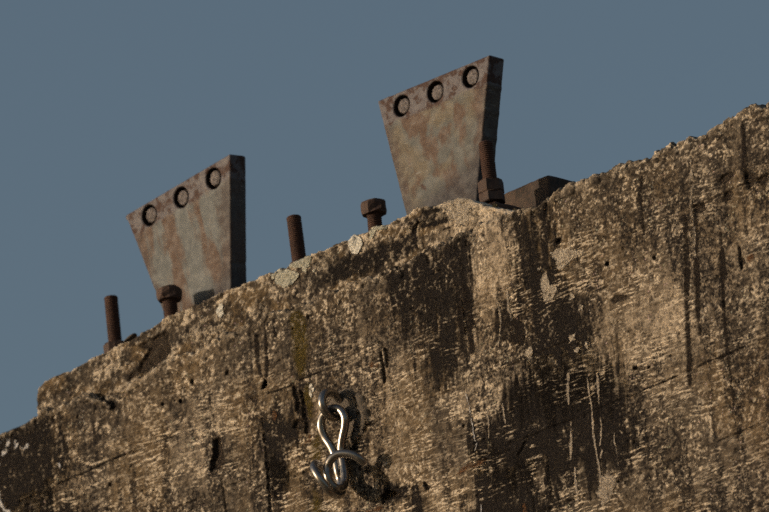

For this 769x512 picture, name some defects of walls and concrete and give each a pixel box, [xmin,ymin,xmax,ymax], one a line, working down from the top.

water stain [324,208,479,391]
water stain [466,198,646,512]
water stain [683,159,701,386]
water stain [719,232,734,407]
water stain [379,480,427,512]